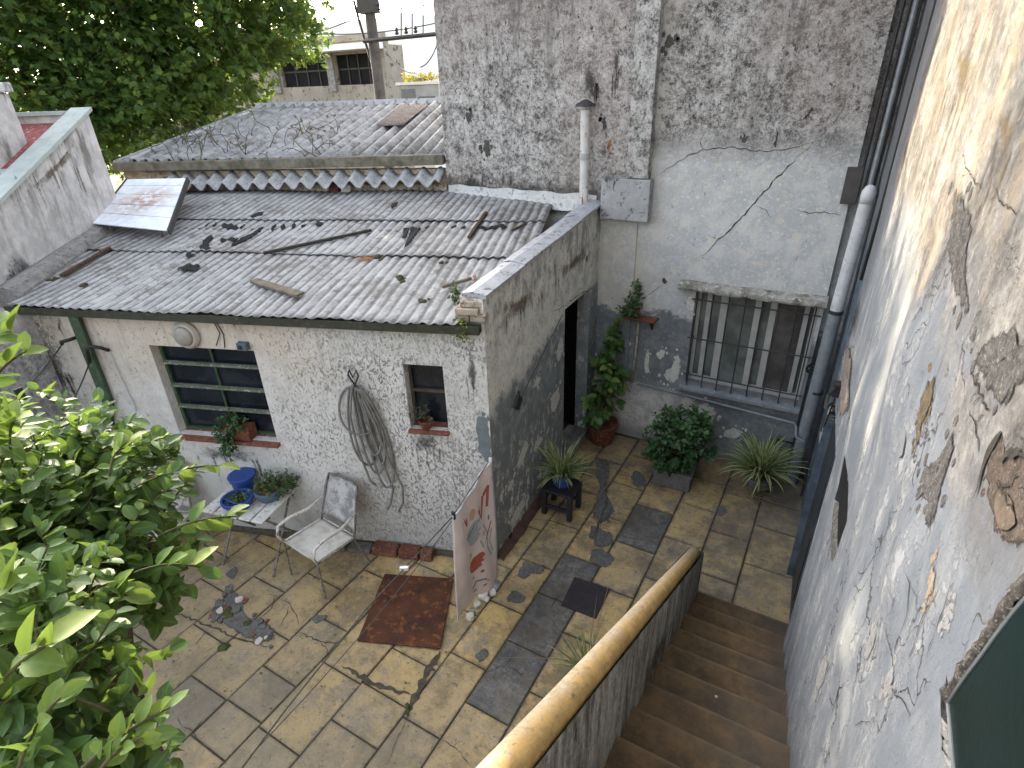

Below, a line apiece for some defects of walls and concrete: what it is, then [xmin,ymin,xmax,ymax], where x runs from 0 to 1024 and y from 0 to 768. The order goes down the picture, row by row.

crack [661,100,850,256]
water stain [505,293,543,331]
peeling [643,346,683,391]
spalling [942,181,982,330]
spalling [970,323,1024,415]
spalling [911,363,959,528]
spalling [973,431,1024,547]
crack [858,523,953,662]